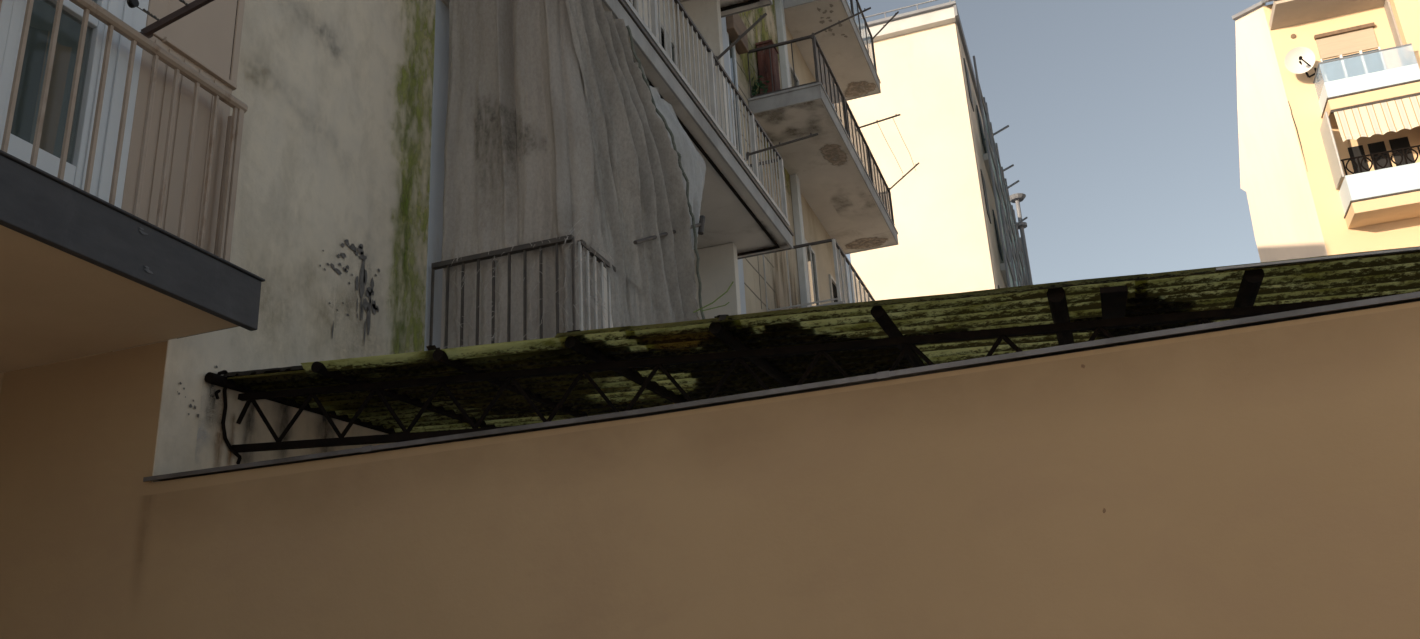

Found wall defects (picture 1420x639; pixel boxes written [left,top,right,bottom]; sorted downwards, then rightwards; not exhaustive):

spalling [845,81,876,97]
peeling [320,239,380,344]
water stain [396,178,411,289]
spalling [845,237,888,249]